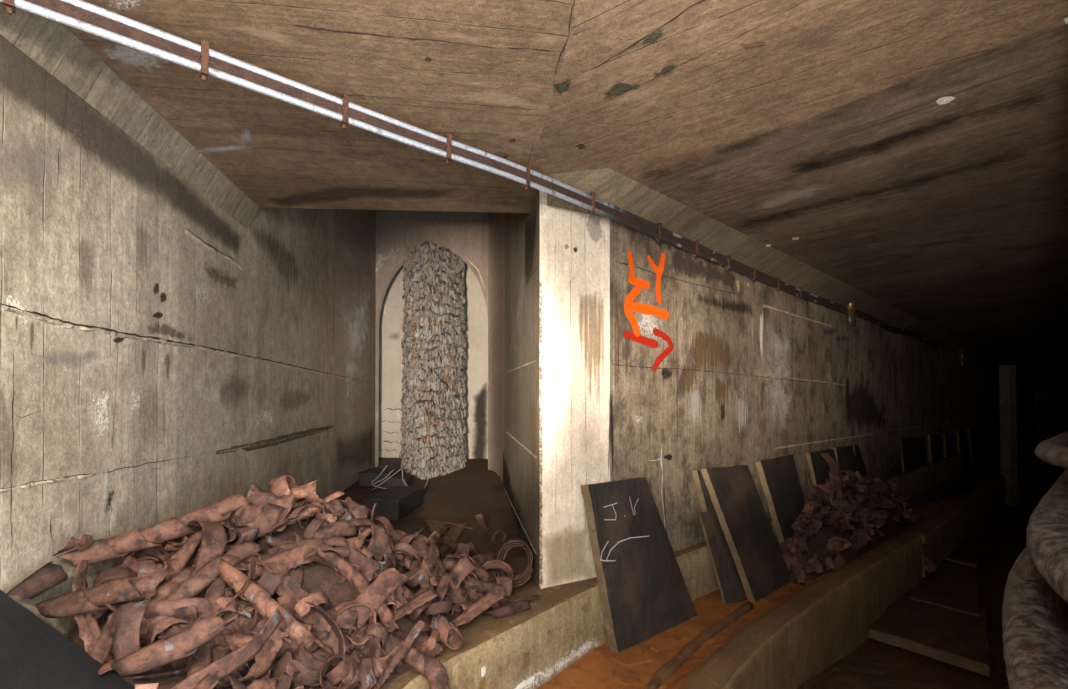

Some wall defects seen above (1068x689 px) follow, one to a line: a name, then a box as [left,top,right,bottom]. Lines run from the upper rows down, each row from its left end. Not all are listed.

crack [287,0,645,80]
crack [584,0,705,72]
crack [104,315,190,473]